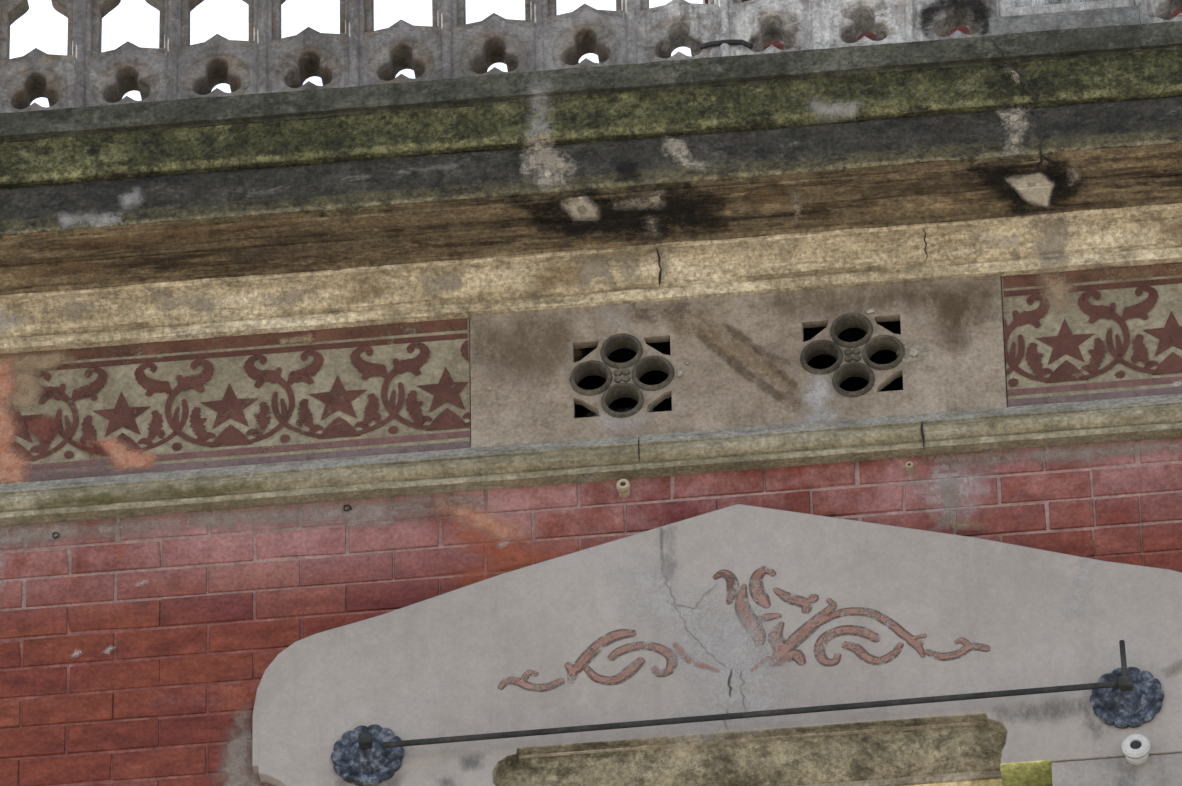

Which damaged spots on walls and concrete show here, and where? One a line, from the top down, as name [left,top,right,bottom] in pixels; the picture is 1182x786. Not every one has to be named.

spalling [968,108,1080,214]
crack [990,39,1060,174]
peeling [0,352,155,484]
crack [660,527,747,731]